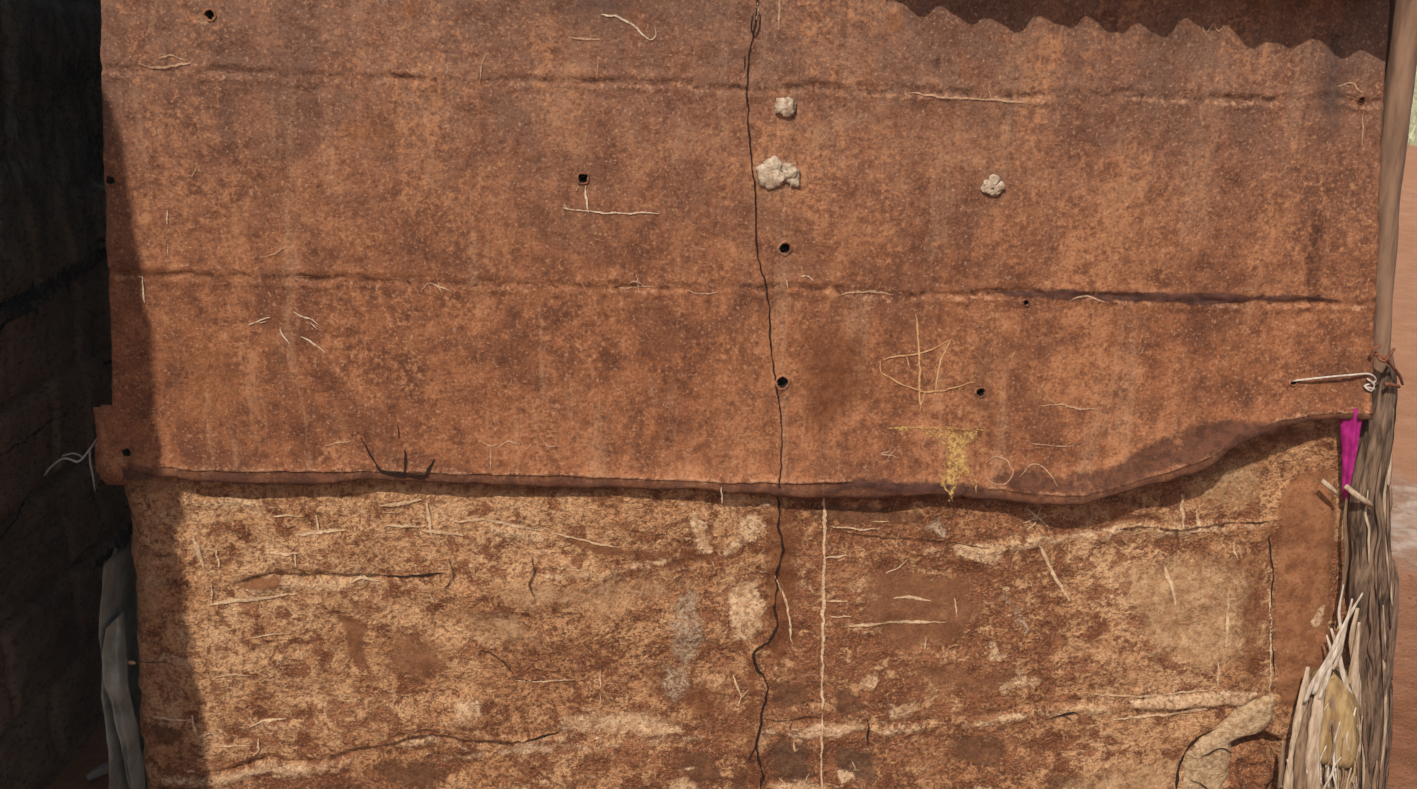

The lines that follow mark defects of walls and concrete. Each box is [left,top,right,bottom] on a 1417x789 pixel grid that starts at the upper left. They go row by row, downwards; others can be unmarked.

rust [971,212,1332,305]
crack [743,0,820,789]
rust [839,420,1326,503]
spalling [338,610,367,668]
spalling [475,539,670,643]
flaking render [655,571,767,701]
flaking render [161,770,196,786]
spalling [227,751,447,789]
flaking render [466,707,754,789]
spalling [765,666,918,789]